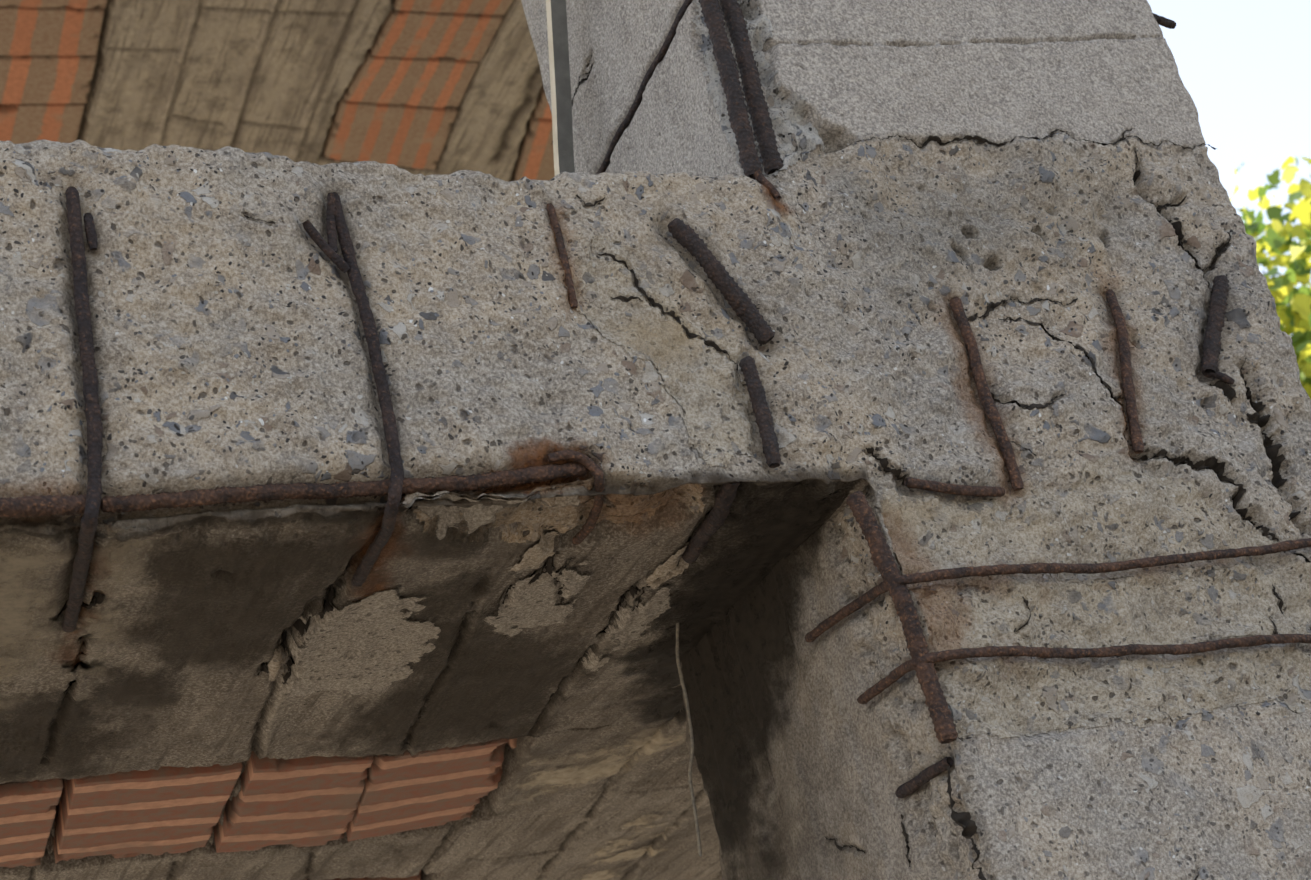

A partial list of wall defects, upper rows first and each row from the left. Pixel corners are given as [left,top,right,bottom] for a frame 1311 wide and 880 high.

crack [848,128,1231,296]
spalling [565,233,754,467]
crack [598,252,746,386]
rust [485,441,589,494]
crack [865,448,910,489]
damp [0,533,365,783]
peeling [265,590,441,699]
spalling [402,476,706,637]
peeling [581,538,690,680]
damp [523,482,852,880]
spalling [881,454,1311,741]